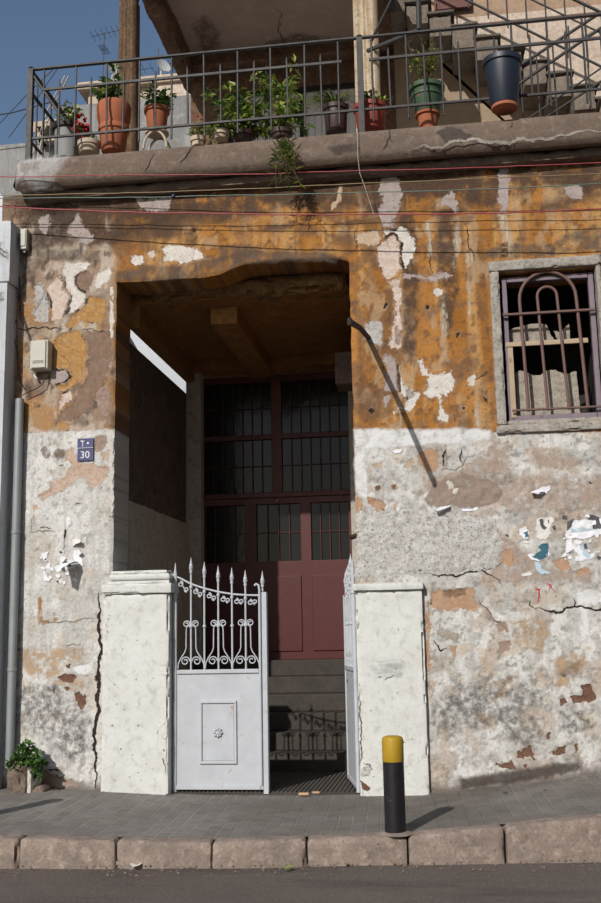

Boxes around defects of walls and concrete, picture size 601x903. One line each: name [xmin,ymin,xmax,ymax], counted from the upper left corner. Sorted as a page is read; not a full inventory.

peeling [564,185,583,199]
peeling [354,176,458,422]
spalling [32,261,115,431]
spalling [23,402,35,432]
spalling [405,446,513,508]
spalling [430,587,547,654]
crack [529,599,601,614]
peeling [23,649,98,710]
crack [39,593,103,788]
spalling [560,684,596,706]
spalling [495,745,535,770]
spalling [552,743,578,756]